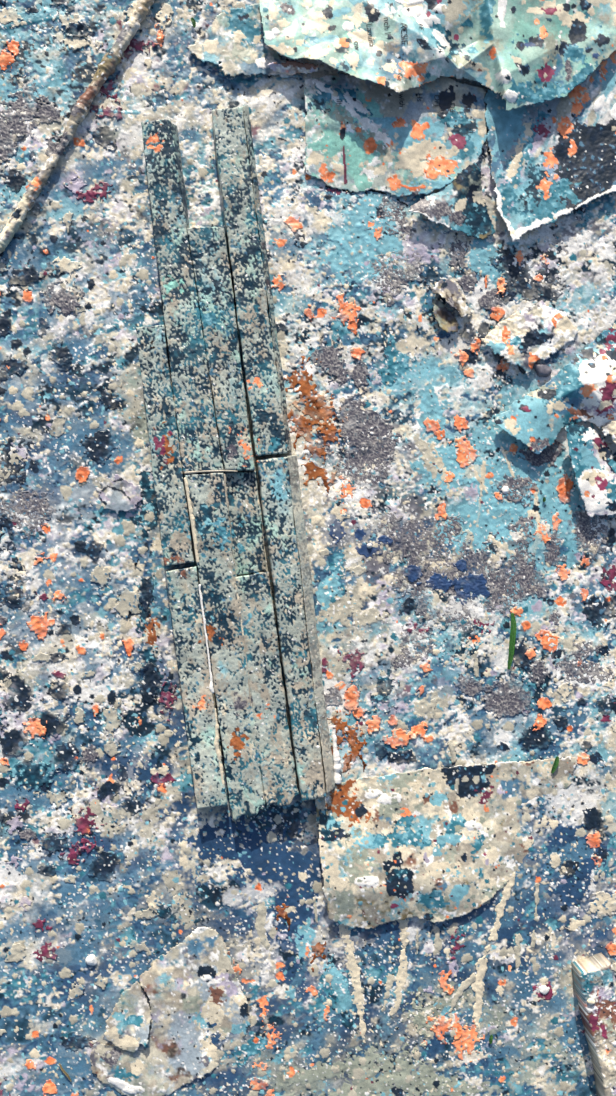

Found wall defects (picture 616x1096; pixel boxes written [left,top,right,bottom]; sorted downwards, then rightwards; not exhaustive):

peeling [187,3,303,78]
peeling [432,279,472,333]
peeling [481,300,579,376]
corrosion [284,356,349,495]
peeling [103,981,152,1053]